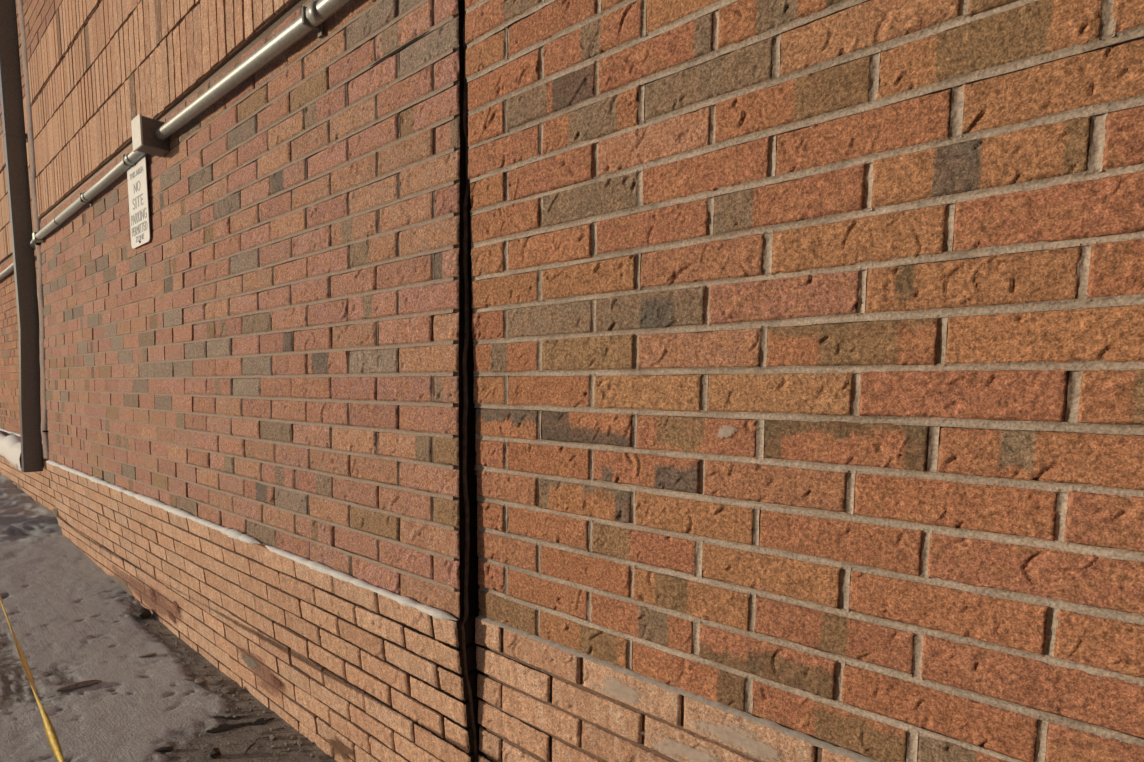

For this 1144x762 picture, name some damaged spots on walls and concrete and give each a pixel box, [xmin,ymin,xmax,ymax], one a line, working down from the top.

crack [370,30,430,67]
crack [455,0,484,762]